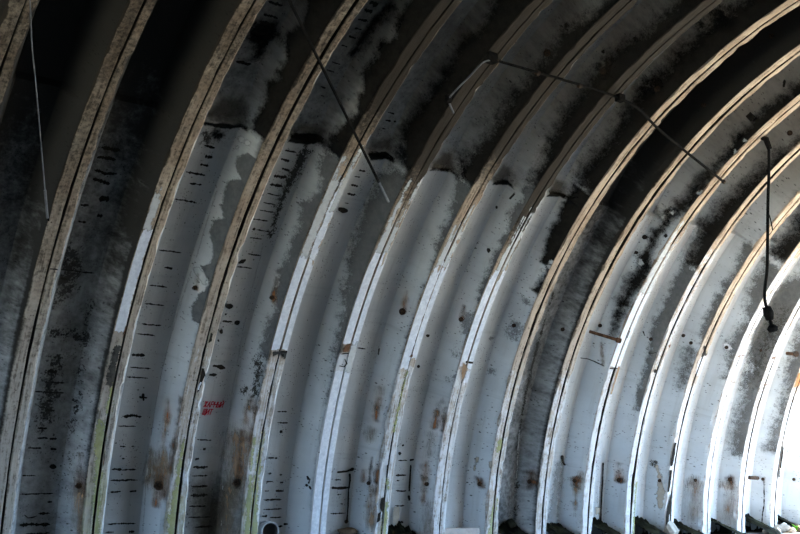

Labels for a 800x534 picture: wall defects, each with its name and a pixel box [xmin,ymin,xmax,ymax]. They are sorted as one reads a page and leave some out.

leakage [52,240,88,310]
leakage [524,181,590,305]
leakage [29,299,95,440]
spalling [197,365,225,392]
rust [146,437,175,507]
rust [224,354,266,532]
leakage [548,463,563,534]
rust [572,474,582,506]